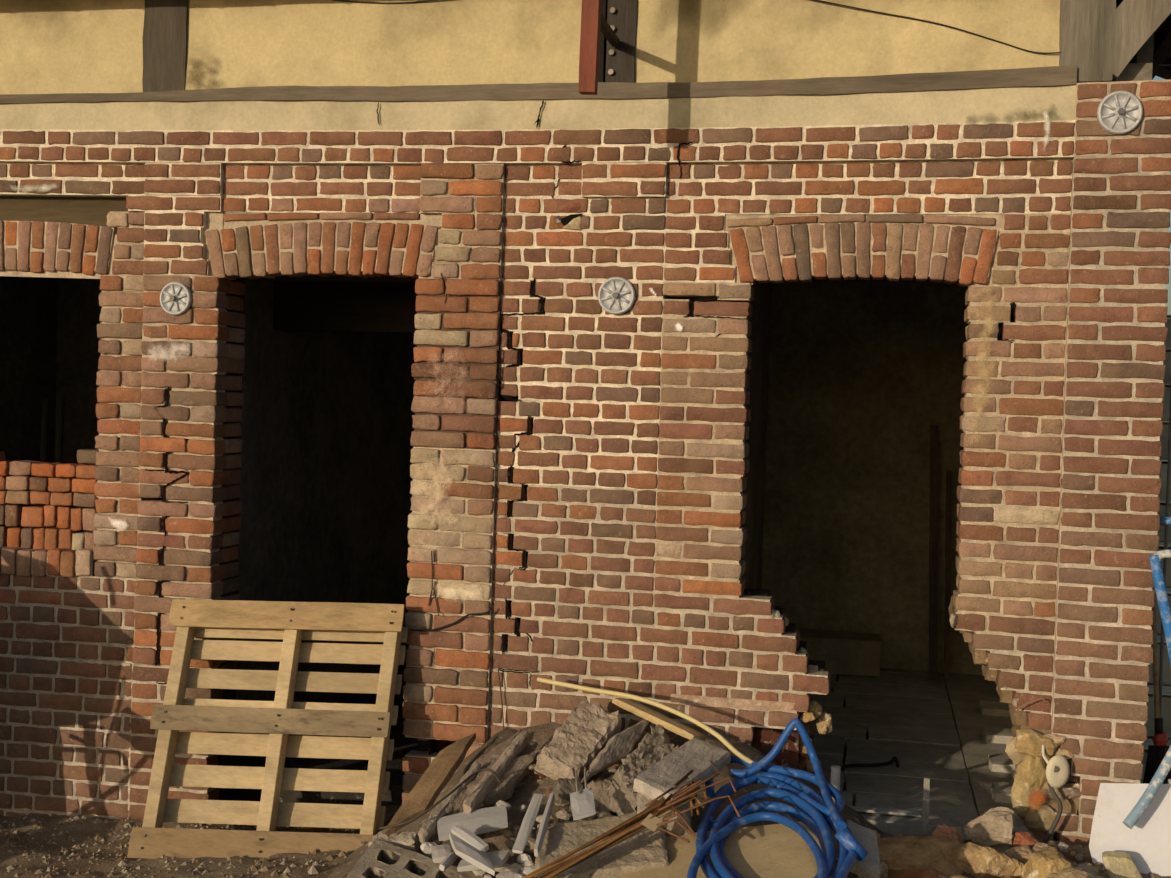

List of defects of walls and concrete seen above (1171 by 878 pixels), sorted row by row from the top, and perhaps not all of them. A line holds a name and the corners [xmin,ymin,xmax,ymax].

crack [551,145,581,198]
crack [677,130,703,179]
crack [998,302,1016,343]
crack [496,279,544,687]
spalling [670,694,832,784]
spalling [948,596,1082,840]